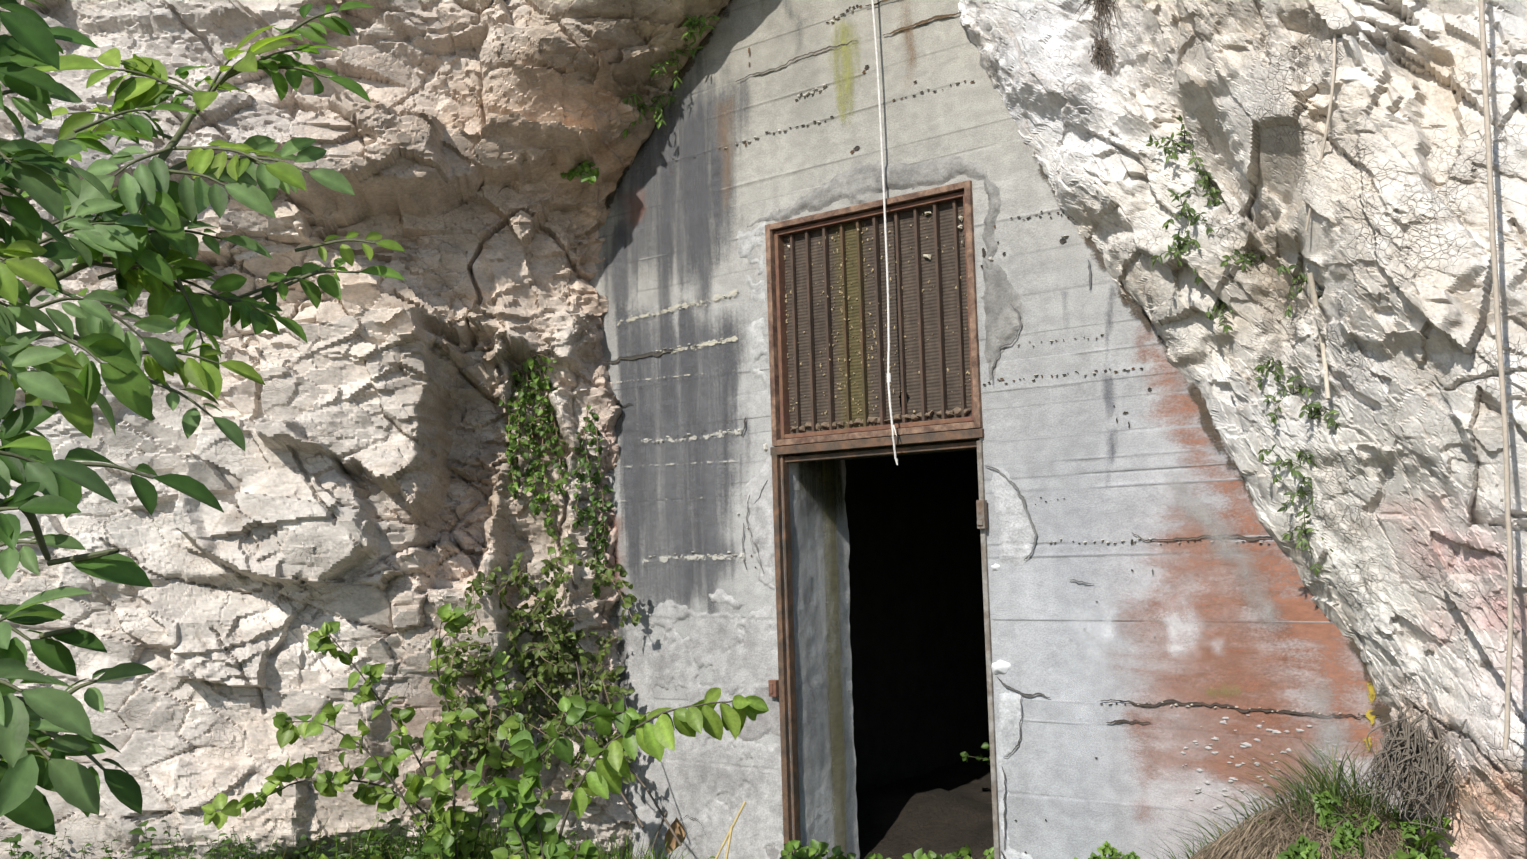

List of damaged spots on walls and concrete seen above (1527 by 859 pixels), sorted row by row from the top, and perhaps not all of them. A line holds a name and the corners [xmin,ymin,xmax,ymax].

water stain [604,71,747,612]
crack [997,677,1050,859]
crack [1101,699,1378,724]
corrosion [1149,334,1383,759]